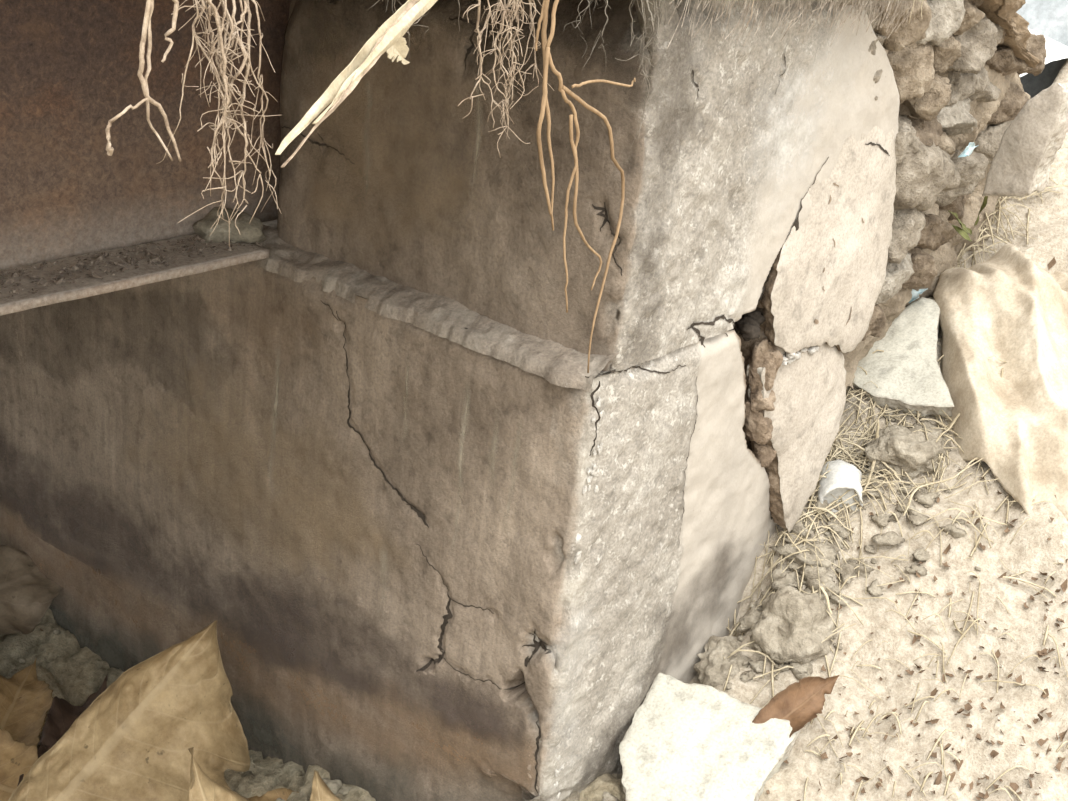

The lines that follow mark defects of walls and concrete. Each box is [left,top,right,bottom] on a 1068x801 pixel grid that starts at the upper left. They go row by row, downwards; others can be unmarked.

crack [866,142,890,156]
crack [592,202,622,276]
crack [785,157,829,242]
crack [585,315,735,544]
flaking render [746,343,846,533]
crack [320,300,519,690]
leakage [0,435,374,691]
leakage [234,707,311,773]
leakage [329,764,383,801]
leakage [420,678,504,738]